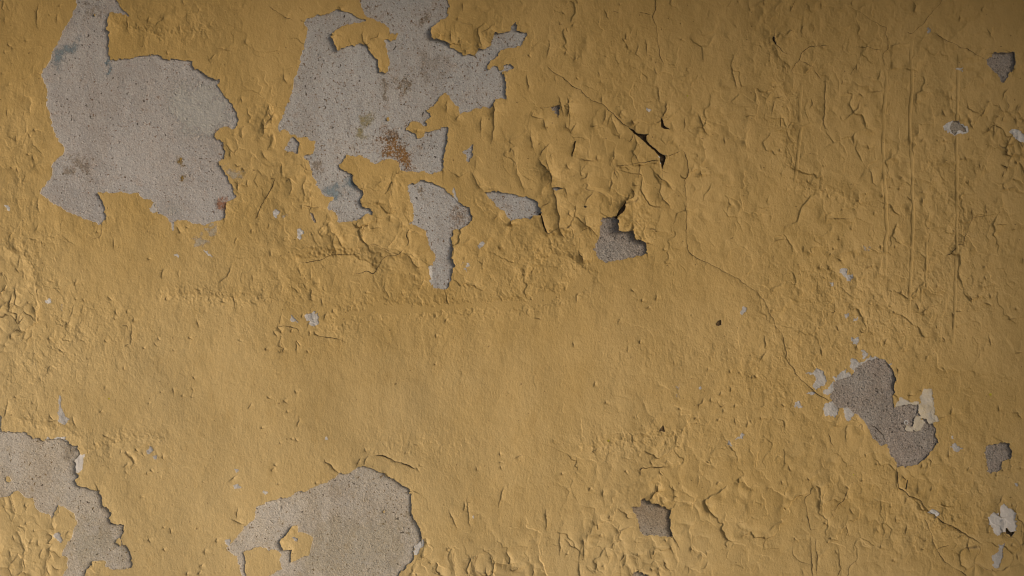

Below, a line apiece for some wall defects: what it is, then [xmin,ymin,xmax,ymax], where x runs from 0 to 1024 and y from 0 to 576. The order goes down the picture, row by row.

peeling [40,0,702,290]
peeling [943,52,1024,199]
crack [549,68,829,401]
peeling [0,395,133,576]
peeling [225,466,534,576]
peeling [585,465,717,576]
crack [793,484,852,575]
peeling [794,337,940,518]
crack [896,468,977,575]
peeling [949,483,1024,576]
peeling [984,442,1012,473]